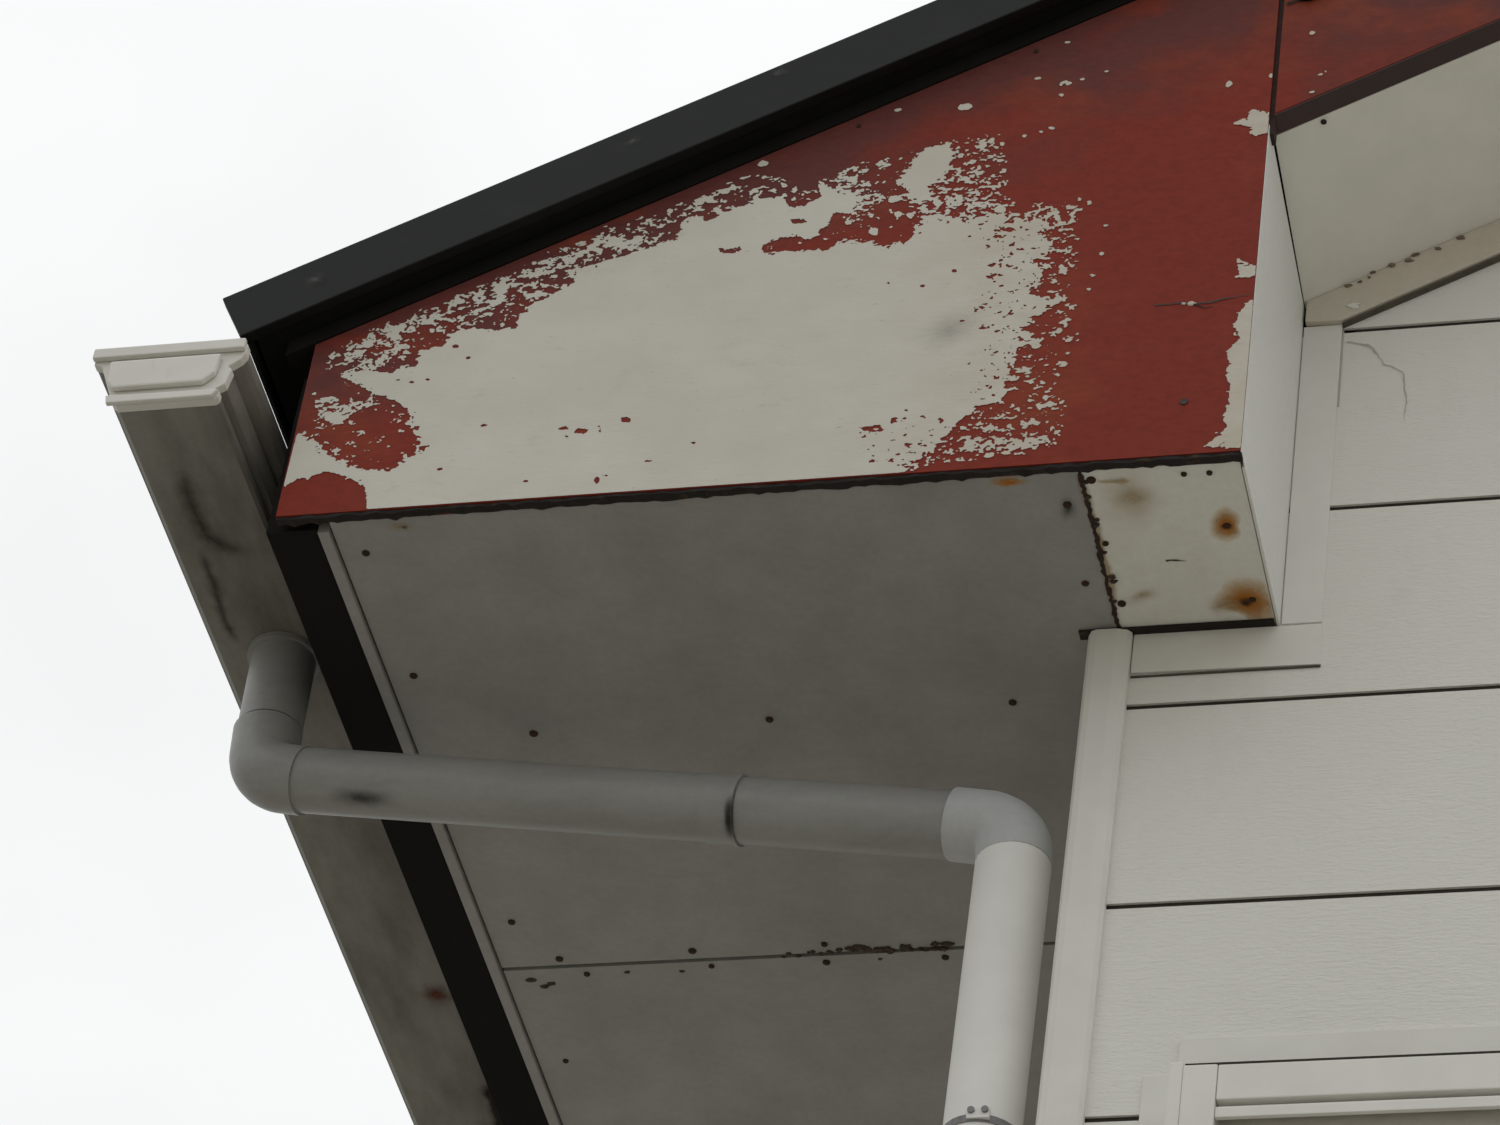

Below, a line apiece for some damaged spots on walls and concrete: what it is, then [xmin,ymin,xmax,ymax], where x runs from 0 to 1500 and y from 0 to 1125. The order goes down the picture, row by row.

peeling [1233,109,1269,136]
peeling [1235,258,1256,278]
peeling [284,134,1095,509]
peeling [1203,300,1253,449]
rust [1215,514,1237,536]
rust [1216,587,1270,617]